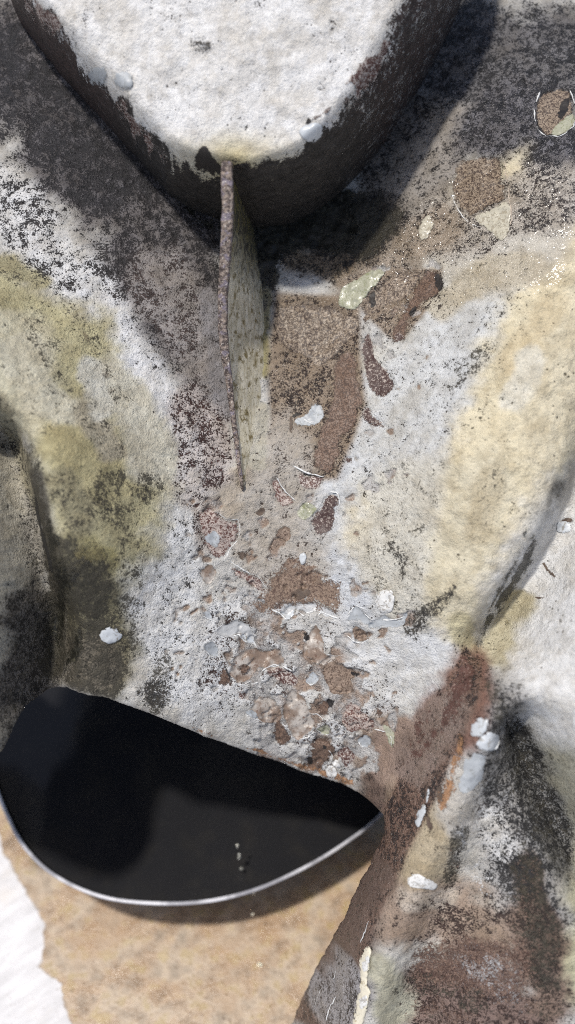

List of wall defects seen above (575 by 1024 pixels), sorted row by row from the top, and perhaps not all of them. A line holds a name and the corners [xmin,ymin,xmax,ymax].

leakage [254,189,359,288]
peeling [275,272,420,397]
leakage [43,517,84,665]
peeling [199,508,266,590]
spalling [276,526,291,542]
leakage [135,665,176,716]
peeling [203,590,403,778]
corrosion [408,651,476,810]
corrosion [404,893,541,1024]
leakage [454,943,528,1023]